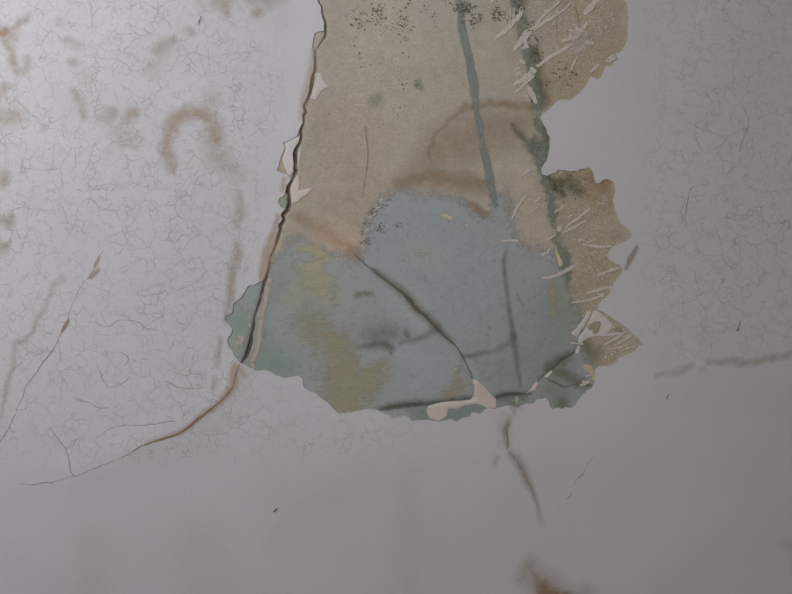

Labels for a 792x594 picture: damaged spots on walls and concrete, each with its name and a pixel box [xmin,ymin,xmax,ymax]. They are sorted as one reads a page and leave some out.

leakage [345,0,414,74]
leakage [445,1,525,31]
peeling [225,0,644,422]
crack [379,275,473,379]
crack [1,319,69,440]
crack [385,402,427,410]
crack [495,391,523,399]